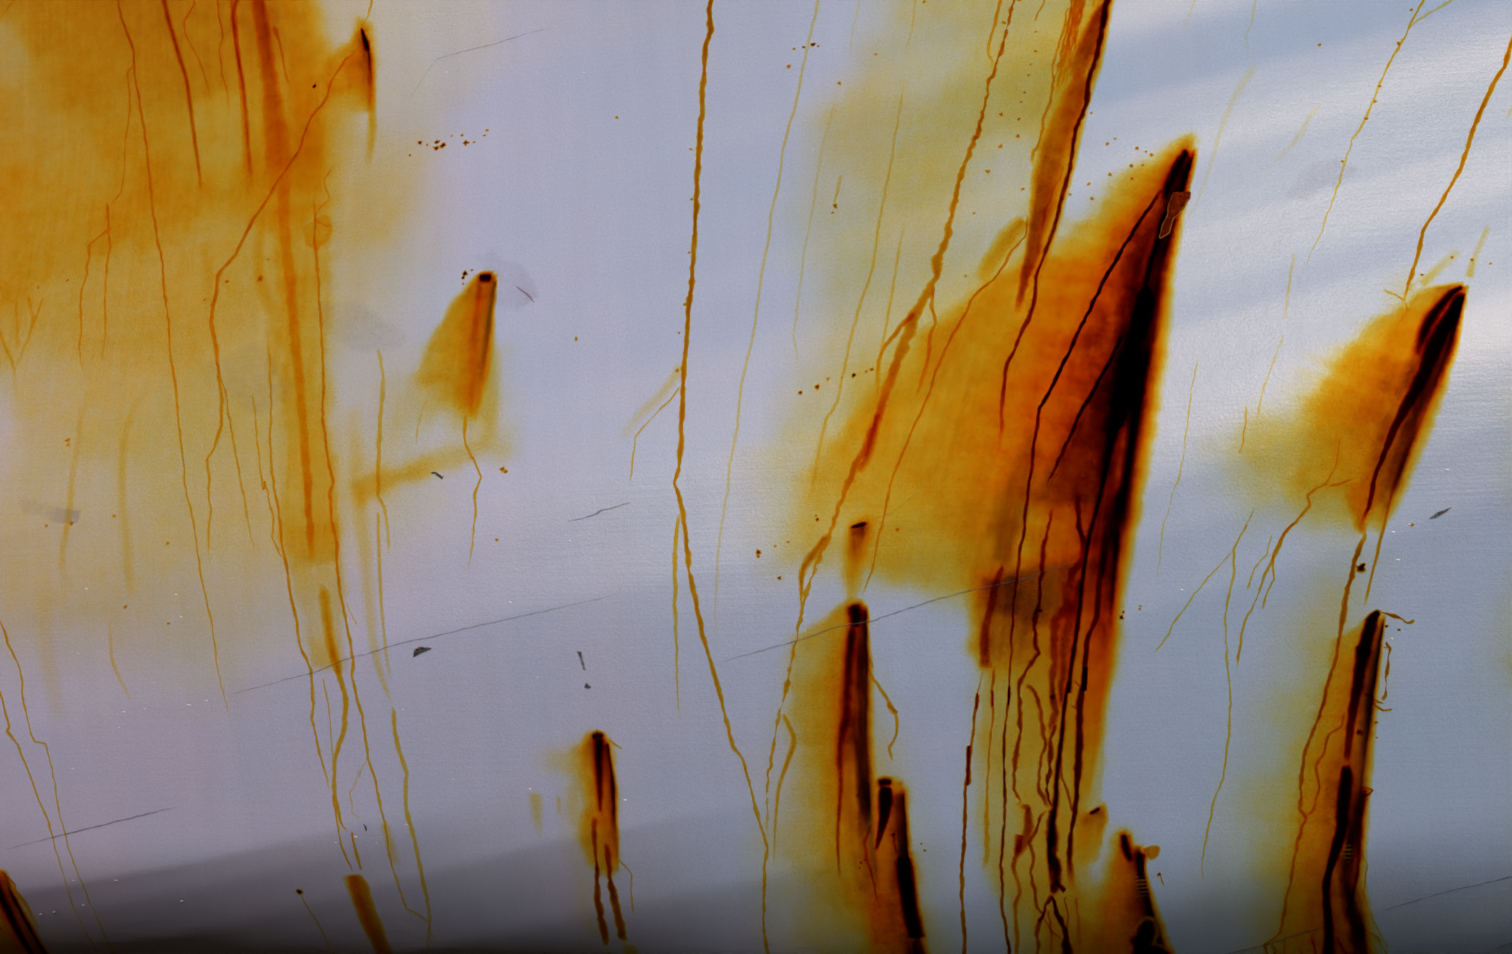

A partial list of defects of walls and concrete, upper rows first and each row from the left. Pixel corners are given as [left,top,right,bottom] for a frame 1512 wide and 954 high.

corrosion [36,0,321,202]
corrosion [350,26,373,98]
corrosion [457,270,497,395]
corrosion [800,515,825,593]
corrosion [849,521,869,575]
corrosion [799,303,923,486]
corrosion [897,0,1194,954]
corrosion [1264,285,1466,954]
corrosion [0,871,48,954]
corrosion [583,731,625,941]
corrosion [833,603,927,954]